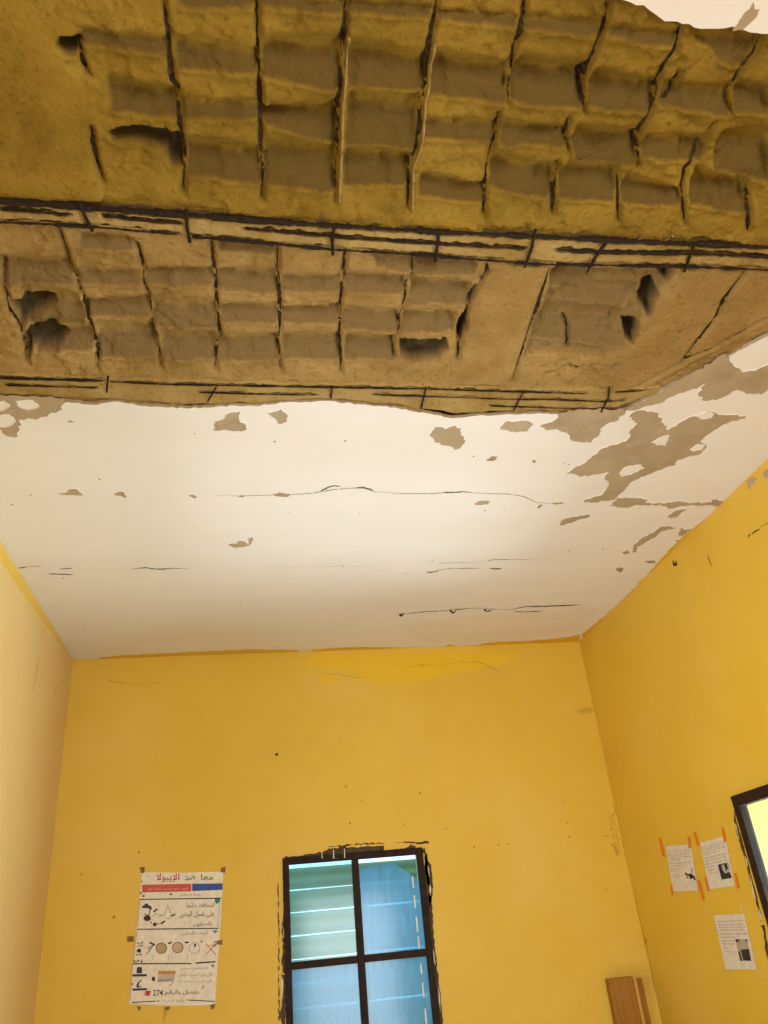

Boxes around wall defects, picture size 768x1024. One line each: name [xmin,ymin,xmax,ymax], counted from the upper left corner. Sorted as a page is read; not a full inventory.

spalling [0,0,768,563]
crack [246,485,564,504]
crack [399,604,583,617]